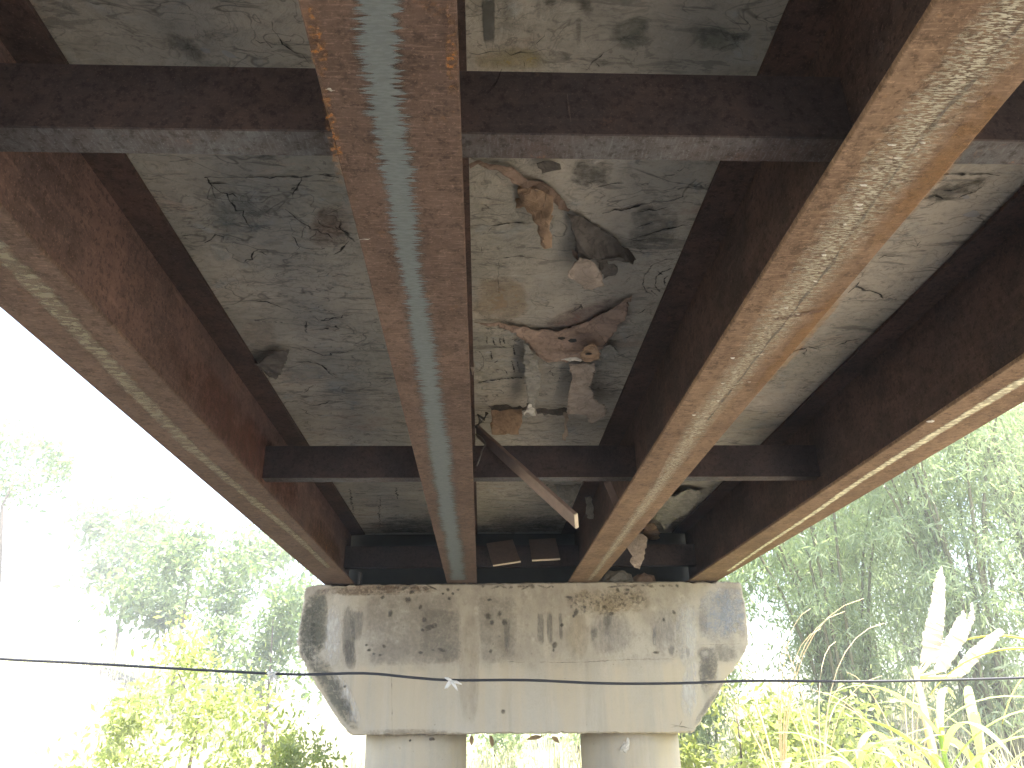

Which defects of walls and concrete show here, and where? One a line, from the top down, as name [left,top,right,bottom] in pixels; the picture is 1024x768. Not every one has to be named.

crack [204,167,353,254]
damp [300,595,356,726]